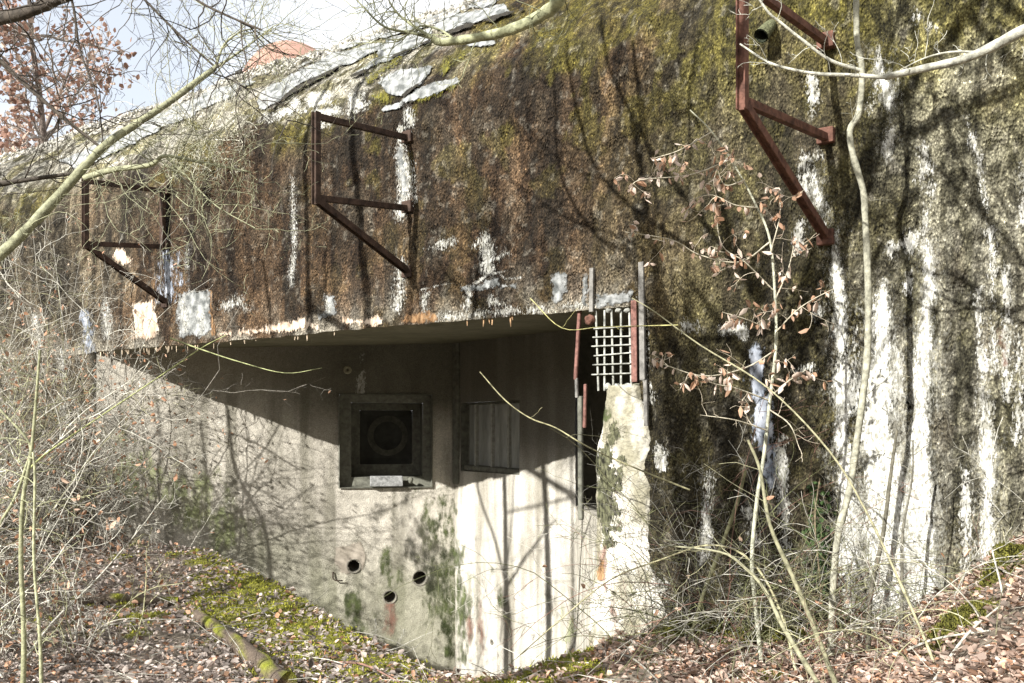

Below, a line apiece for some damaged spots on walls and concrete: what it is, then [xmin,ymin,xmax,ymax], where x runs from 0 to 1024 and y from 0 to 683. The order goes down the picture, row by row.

peeling [59,0,511,169]
efflorescence [806,74,823,117]
efflorescence [392,107,418,224]
efflorescence [966,116,989,205]
efflorescence [390,255,409,314]
efflorescence [432,231,510,276]
water stain [420,292,588,322]
efflorescence [791,218,806,255]
water stain [740,344,792,560]
efflorescence [798,140,941,627]
efflorescence [958,226,1024,571]
water stain [404,500,477,662]